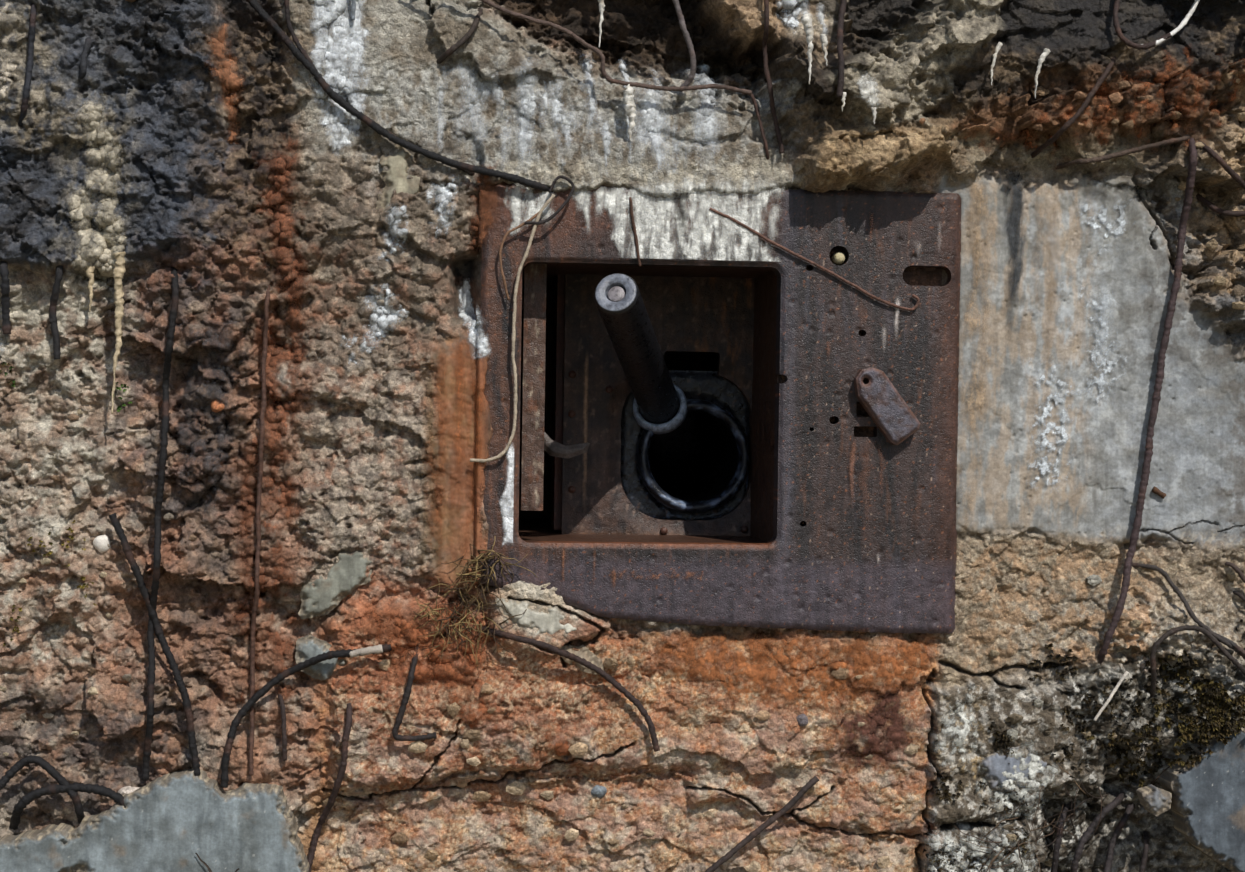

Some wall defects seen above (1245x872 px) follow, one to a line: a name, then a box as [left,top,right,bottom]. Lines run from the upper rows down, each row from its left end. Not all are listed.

corrosion [210,24,243,143]
spalling [467,0,935,151]
efflorescence [69,102,126,288]
efflorescence [510,185,551,233]
efflorescence [577,179,780,262]
spalling [919,0,1245,333]
corrosion [234,139,307,704]
spalling [0,247,1245,872]
crack [1139,520,1245,545]
crack [322,719,634,802]
corrosion [657,633,930,767]
crack [687,660,1071,872]